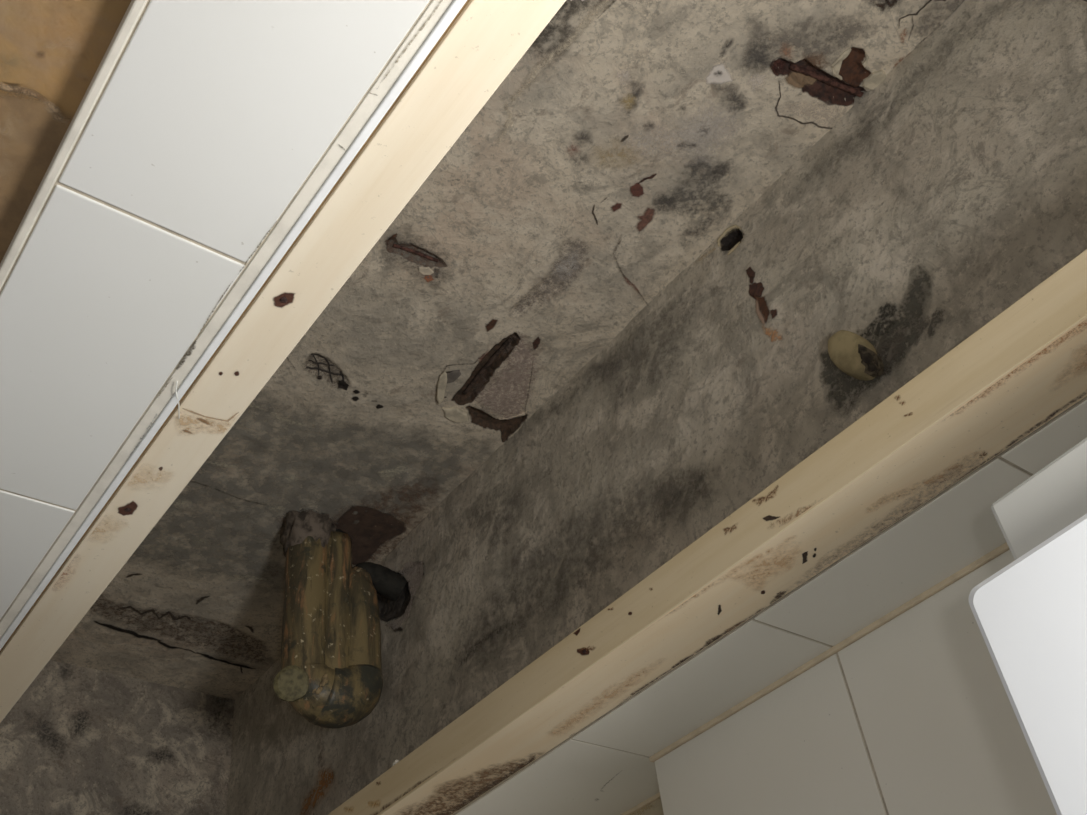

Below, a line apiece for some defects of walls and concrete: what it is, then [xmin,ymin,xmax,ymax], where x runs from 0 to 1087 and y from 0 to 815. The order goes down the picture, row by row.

leakage [532,0,589,53]
leakage [871,0,897,11]
crack [899,0,965,41]
spalling [770,47,886,106]
spalling [385,233,447,285]
corrosion [273,293,295,308]
leakage [821,268,945,409]
spalling [304,353,383,409]
spalling [436,332,536,442]
crack [94,621,255,673]
leakage [591,591,786,709]
leakage [403,756,534,815]